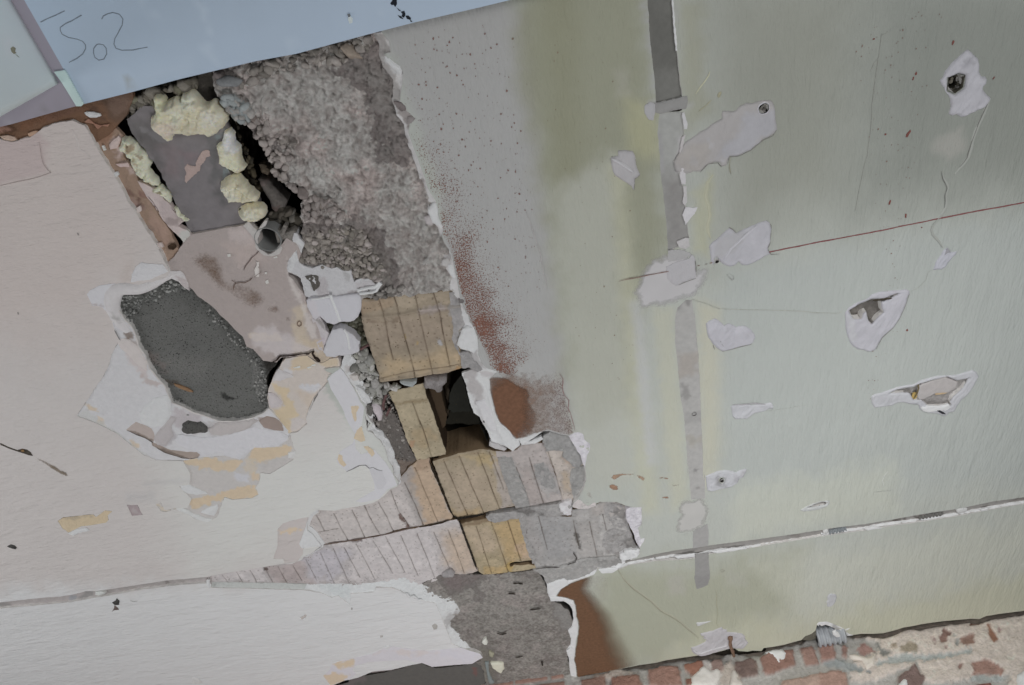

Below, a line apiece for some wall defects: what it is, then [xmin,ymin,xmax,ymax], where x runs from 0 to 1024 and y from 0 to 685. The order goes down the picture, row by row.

spalling [212,31,543,451]
rust [415,36,572,438]
hole [850,295,893,323]
flaking render [77,315,401,522]
spalling [895,377,967,414]
peeling [273,517,309,563]
spalling [789,500,1024,540]
spalling [211,541,774,685]
rust [557,578,627,677]